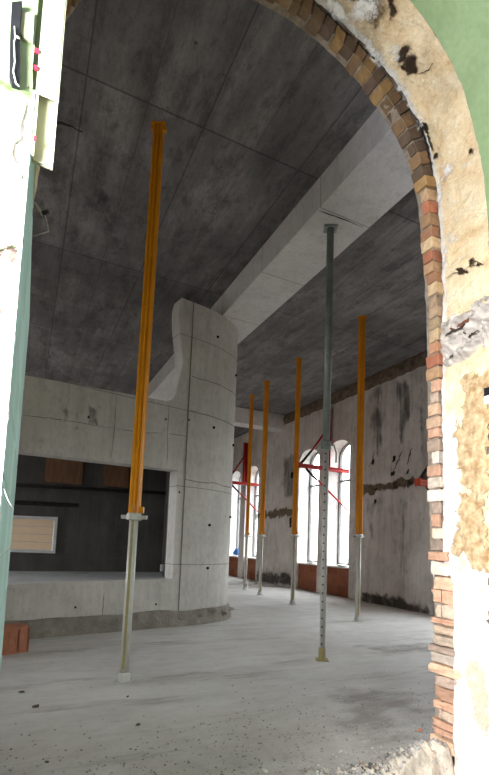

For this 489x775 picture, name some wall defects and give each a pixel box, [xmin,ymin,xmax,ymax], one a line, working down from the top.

peeling [327,0,384,65]
spalling [12,100,37,200]
spalling [0,241,19,460]
spalling [440,295,489,367]
flaking render [451,367,489,592]